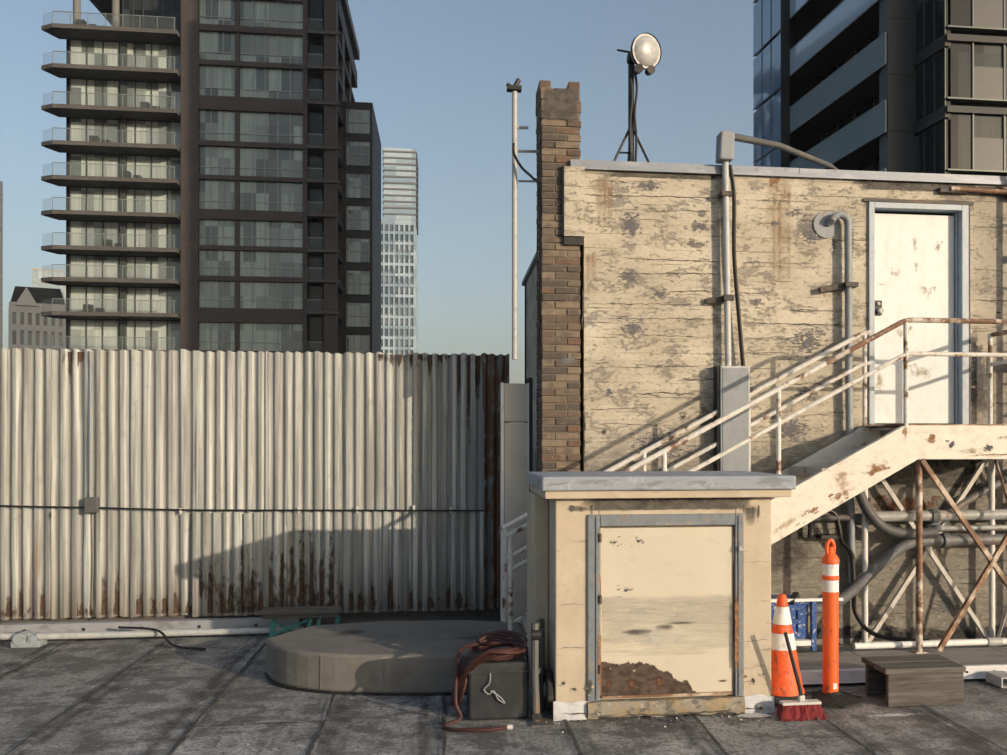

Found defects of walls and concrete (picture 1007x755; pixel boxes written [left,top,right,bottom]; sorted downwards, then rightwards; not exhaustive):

peeling [681,211,711,248]
peeling [799,227,837,254]
peeling [787,327,826,359]
peeling [971,343,988,391]
rust [378,354,480,425]
peeling [768,416,815,444]
rust [199,533,376,613]
rust [2,591,44,617]
rust [77,576,119,616]
rust [136,593,192,615]
rust [388,577,468,610]